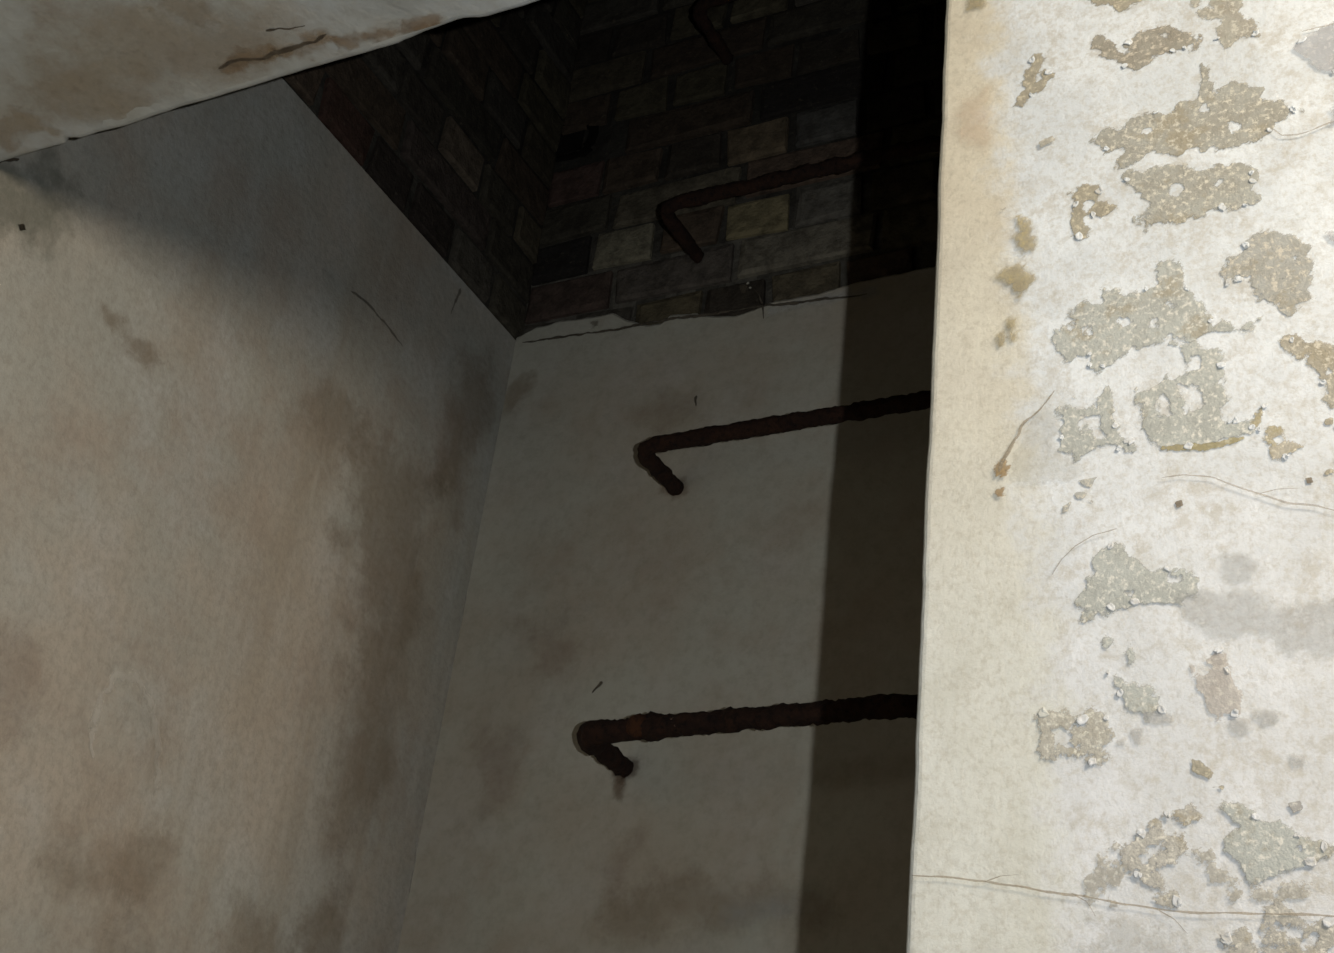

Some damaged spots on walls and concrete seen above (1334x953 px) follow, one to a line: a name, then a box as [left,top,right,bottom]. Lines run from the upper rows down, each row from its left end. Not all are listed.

crack [218,25,326,69]
peeling [1015,53,1055,107]
peeling [1089,0,1303,232]
peeling [1068,184,1117,240]
peeling [1052,230,1314,462]
peeling [1280,333,1334,425]
corrosion [994,460,1011,497]
peeling [1075,542,1200,623]
peeling [1189,646,1242,721]
peeling [1033,707,1116,766]
peeling [1084,759,1334,953]
crack [912,875,1334,933]